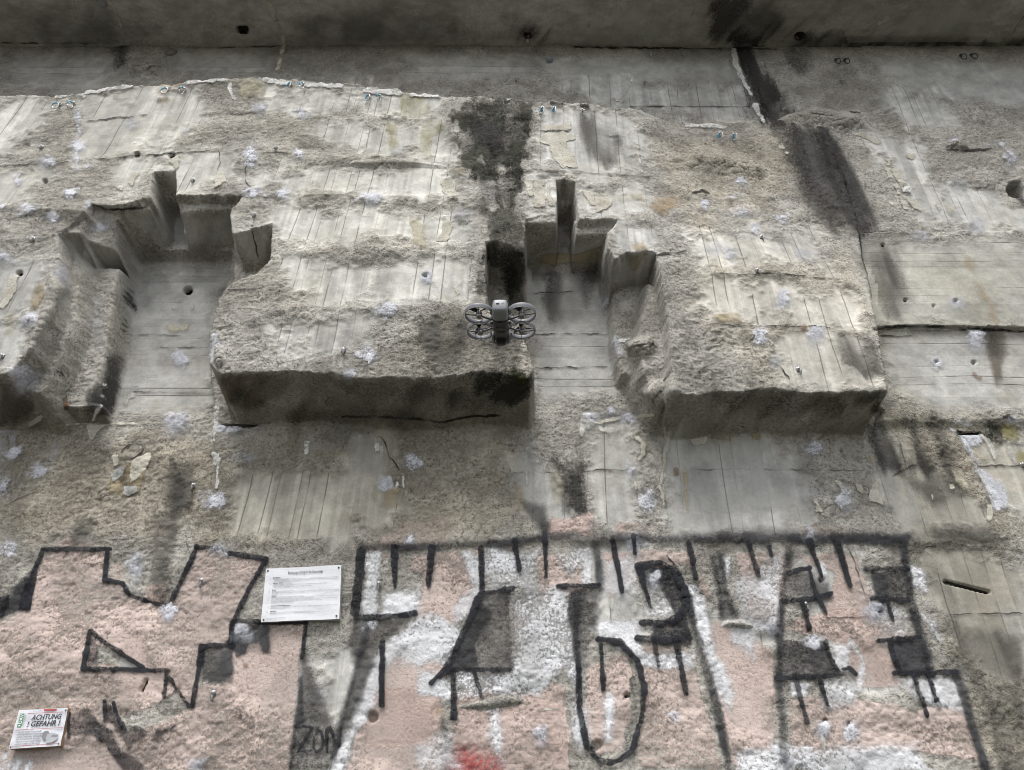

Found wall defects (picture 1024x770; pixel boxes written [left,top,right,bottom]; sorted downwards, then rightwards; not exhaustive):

damp [706,0,869,236]
peeling [214,171,227,187]
damp [448,97,535,257]
crack [342,414,501,470]
peeling [579,413,655,436]
damp [553,454,589,514]